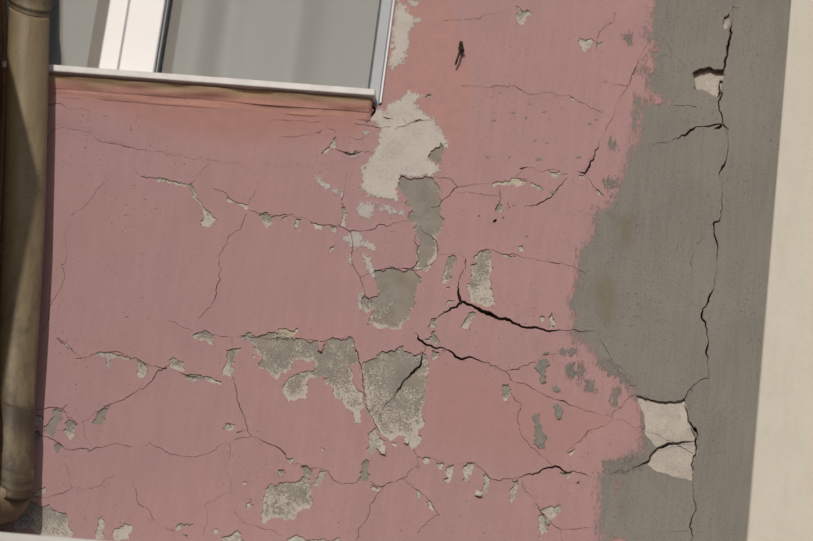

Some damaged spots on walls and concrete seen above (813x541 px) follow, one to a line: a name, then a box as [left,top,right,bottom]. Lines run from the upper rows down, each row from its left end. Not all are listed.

spalling [693,70,725,97]
peeling [428,143,444,163]
crack [713,8,733,251]
peeling [361,176,444,330]
peeling [462,250,495,330]
crack [450,261,520,327]
crack [701,272,717,373]
peeling [261,457,326,524]
peeling [169,315,442,492]
crack [397,338,432,392]
spalling [637,397,698,481]
crack [649,388,698,539]